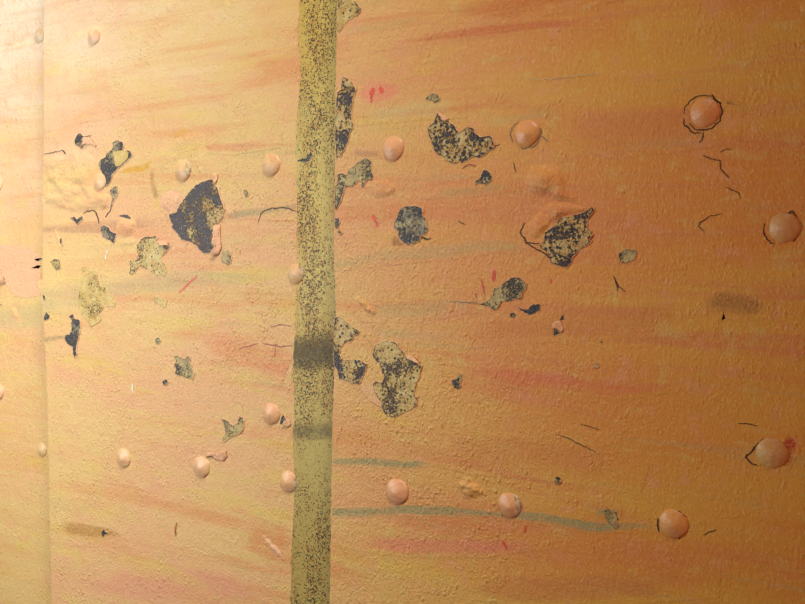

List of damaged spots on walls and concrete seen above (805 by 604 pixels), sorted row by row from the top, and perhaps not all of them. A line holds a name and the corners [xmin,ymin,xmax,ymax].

peeling [99,140,133,244]
peeling [129,235,171,277]
peeling [169,173,233,265]
peeling [394,205,431,246]
peeling [426,93,500,164]
peeling [475,169,493,186]
peeling [539,206,595,268]
crack [683,94,740,197]
peeling [65,267,116,359]
peeling [280,0,423,604]
peeling [481,277,542,318]